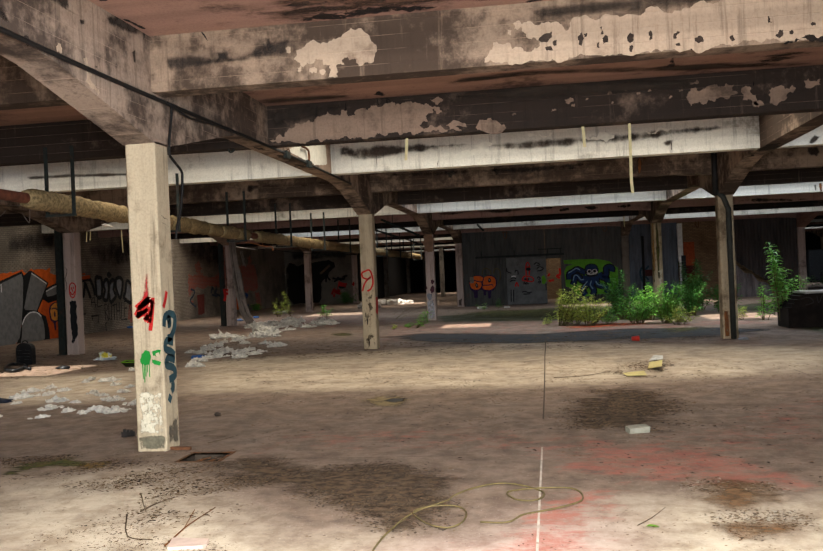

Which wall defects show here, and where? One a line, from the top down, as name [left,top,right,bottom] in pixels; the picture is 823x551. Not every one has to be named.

peeling [286,28,377,78]
water stain [281,0,439,21]
water stain [526,0,708,17]
peeling [485,0,823,65]
peeling [669,79,820,107]
peeling [254,97,506,168]